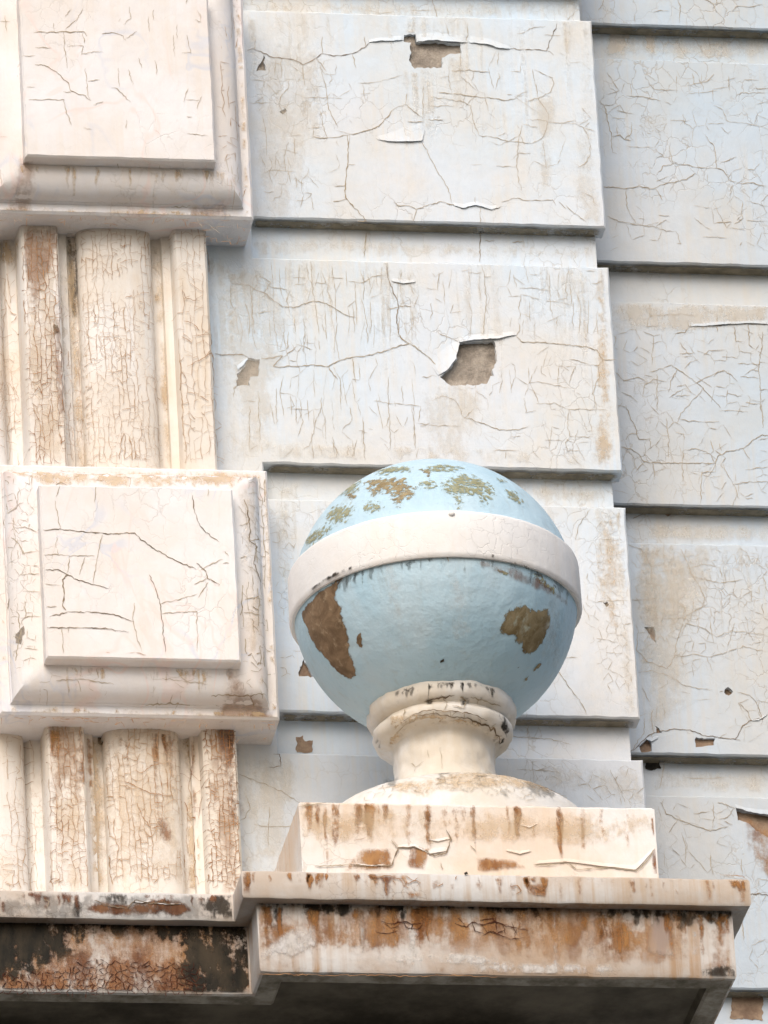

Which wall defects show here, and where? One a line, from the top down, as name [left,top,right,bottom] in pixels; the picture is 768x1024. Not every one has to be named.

spalling [369,32,511,69]
crack [188,5,594,256]
crack [598,73,768,250]
spalling [234,357,259,386]
spalling [430,332,517,386]
crack [0,206,768,910]
rust [356,805,376,835]
spalling [735,805,768,837]
rust [349,850,391,895]
rust [410,849,427,868]
rust [479,858,517,870]
leakage [0,895,249,992]